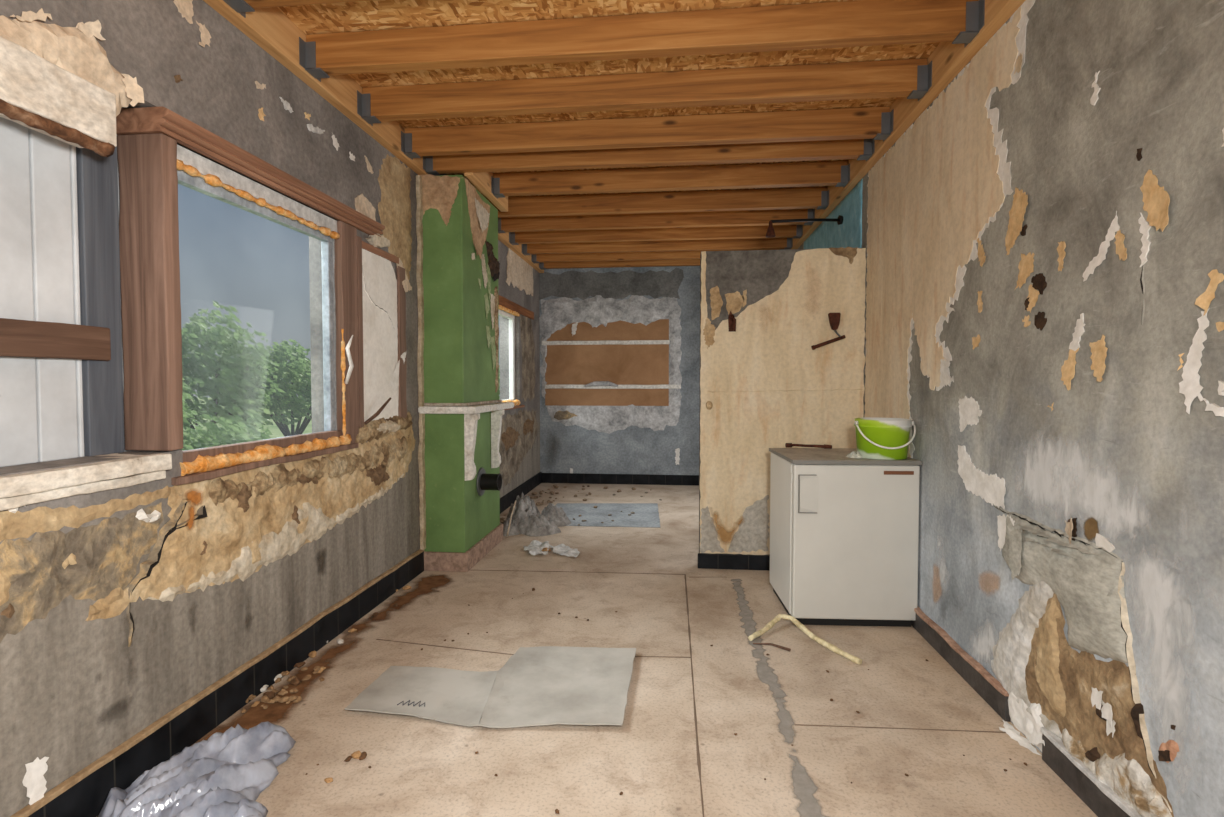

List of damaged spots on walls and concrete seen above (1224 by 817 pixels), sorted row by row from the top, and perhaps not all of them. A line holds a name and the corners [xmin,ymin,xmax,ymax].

peeling [0,8,144,117]
peeling [173,0,211,47]
peeling [279,97,412,292]
peeling [1005,188,1066,331]
peeling [1082,148,1170,282]
peeling [471,240,684,486]
peeling [1177,269,1224,417]
crack [126,499,208,647]
spalling [0,411,415,643]
peeling [700,495,770,553]
peeling [957,396,1015,551]
spalling [991,581,1181,817]